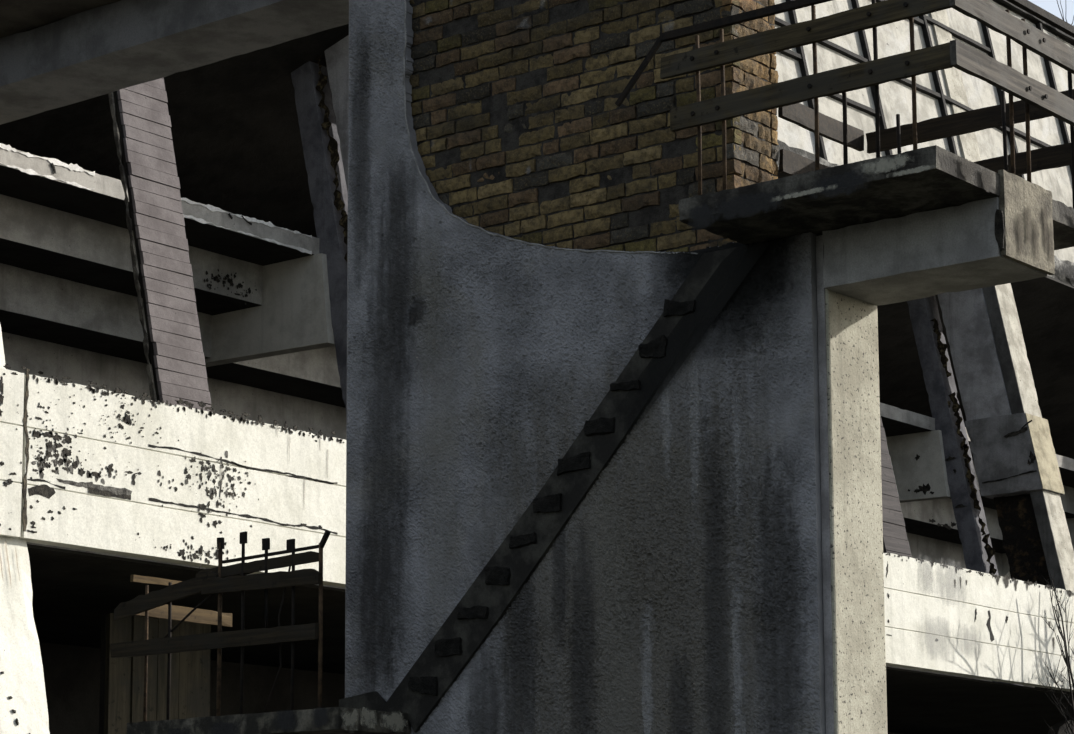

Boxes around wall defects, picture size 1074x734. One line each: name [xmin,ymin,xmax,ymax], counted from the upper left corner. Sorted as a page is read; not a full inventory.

spalling [930,319,951,377]
peeling [0,364,344,533]
peeling [155,451,251,569]
crack [149,444,338,484]
crack [149,498,338,534]
spalling [883,392,1074,595]